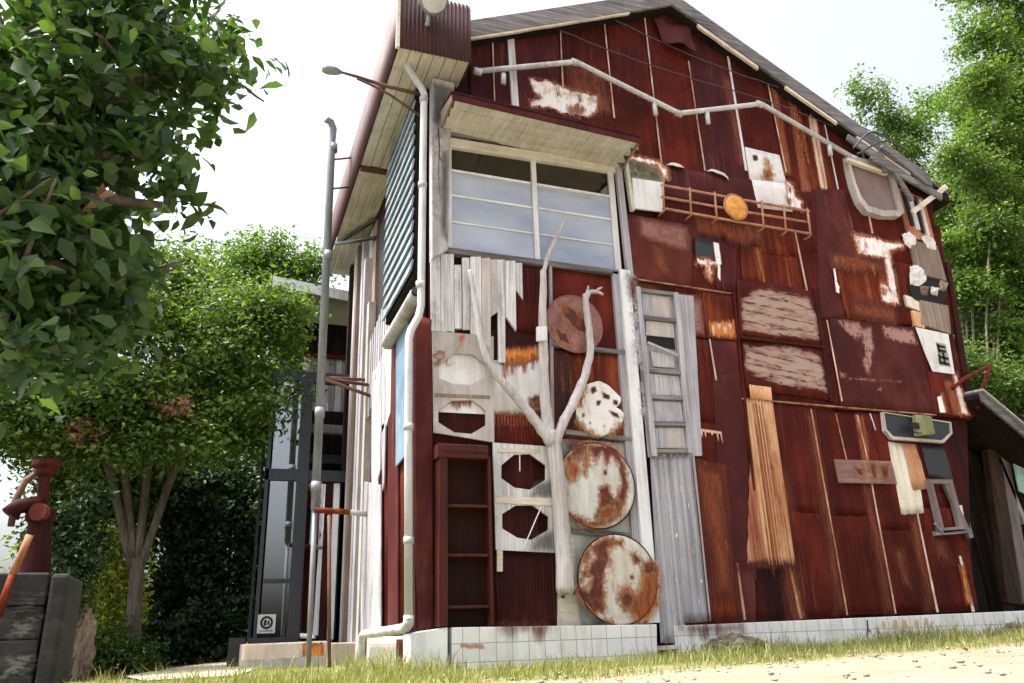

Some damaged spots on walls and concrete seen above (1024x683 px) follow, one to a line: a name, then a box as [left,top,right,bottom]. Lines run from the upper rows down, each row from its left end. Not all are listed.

peeling [529,78,597,117]
peeling [697,242,722,280]
spalling [853,231,948,306]
corrosion [502,346,539,378]
corrosion [708,319,736,339]
peeling [741,288,828,393]
corrosion [551,300,663,625]
corrosion [695,462,733,598]
corrosion [748,403,805,619]